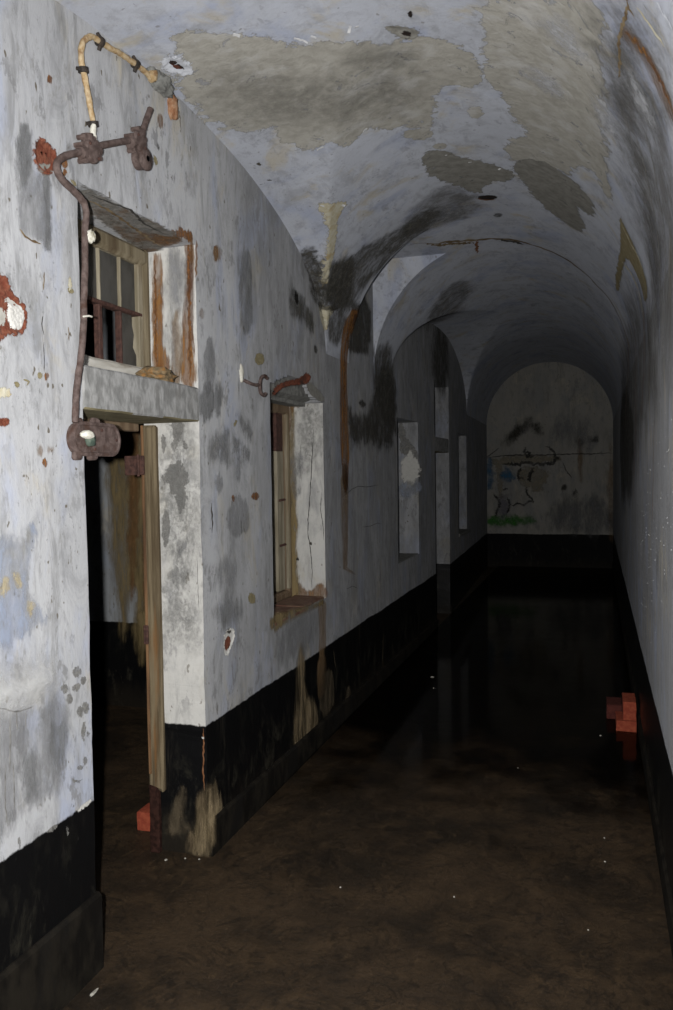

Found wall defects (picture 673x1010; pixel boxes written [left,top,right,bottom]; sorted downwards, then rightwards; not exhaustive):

peeling [146,0,615,232]
corrosion [622,28,673,120]
spalling [0,275,27,341]
corrosion [61,160,198,386]
peeling [318,201,347,286]
damp [290,194,471,448]
crack [410,238,631,351]
peeling [615,217,647,307]
corrosion [340,309,358,571]